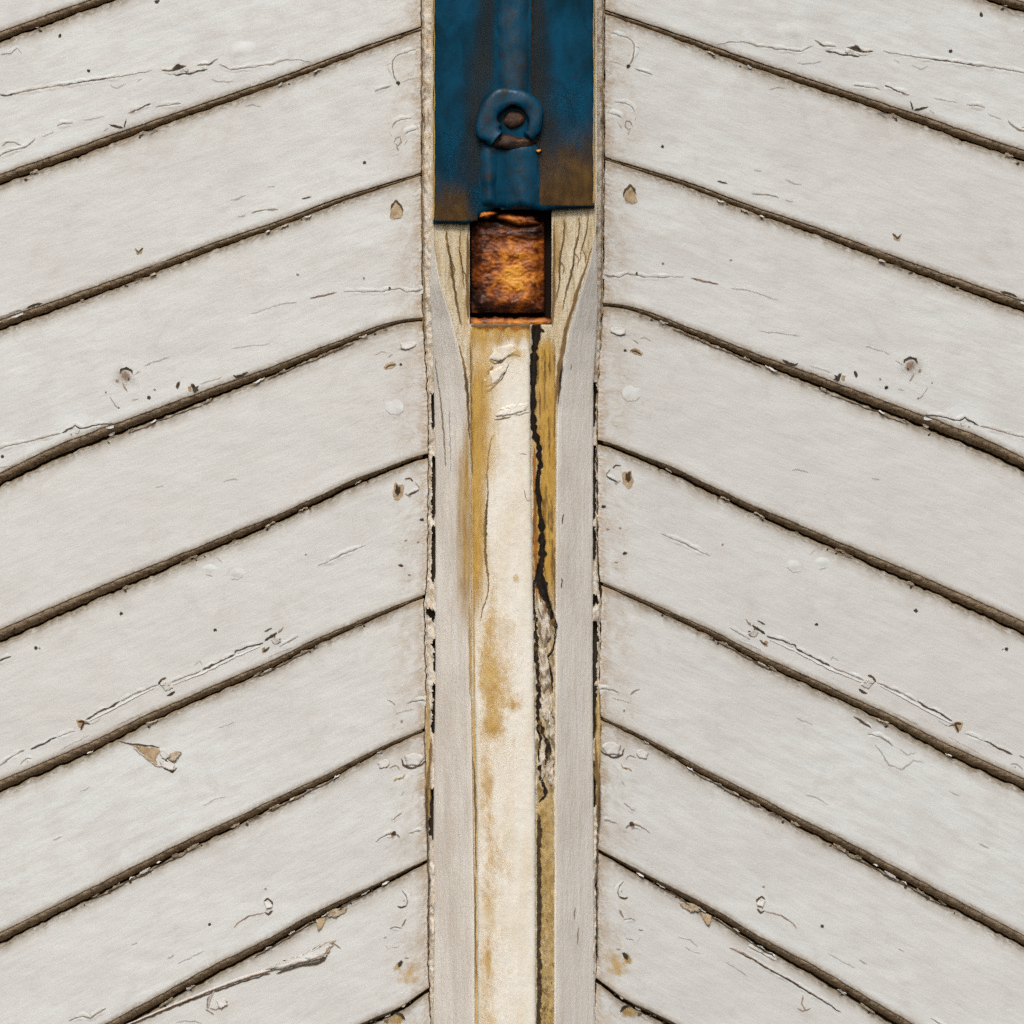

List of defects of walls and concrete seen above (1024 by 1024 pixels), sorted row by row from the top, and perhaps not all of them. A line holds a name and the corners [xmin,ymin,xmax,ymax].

crack [0,56,312,115]
crack [717,38,908,97]
crack [886,49,1024,76]
crack [0,119,73,159]
crack [1008,119,1024,135]
peeling [484,344,516,388]
crack [311,0,572,802]
rust [459,222,592,1024]
crack [0,633,300,768]
crack [729,625,1024,772]
peeling [119,741,182,773]
peeling [128,940,340,1024]